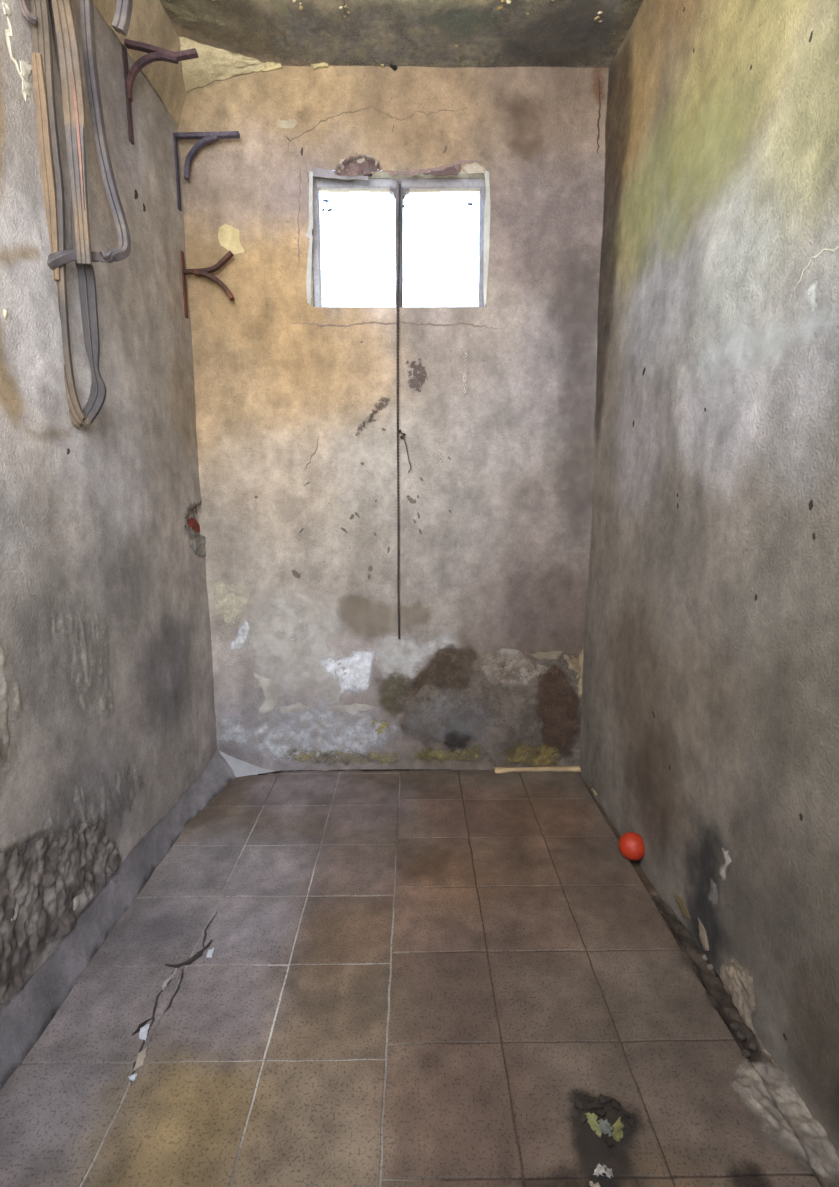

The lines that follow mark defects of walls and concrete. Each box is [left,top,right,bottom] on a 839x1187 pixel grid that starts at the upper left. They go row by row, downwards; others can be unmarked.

damp [163,0,631,68]
crack [286,106,466,265]
spalling [306,145,491,306]
peeling [0,646,22,775]
peeling [571,647,584,707]
spalling [0,815,121,1004]
crack [131,912,217,1086]
spalling [719,959,777,1066]